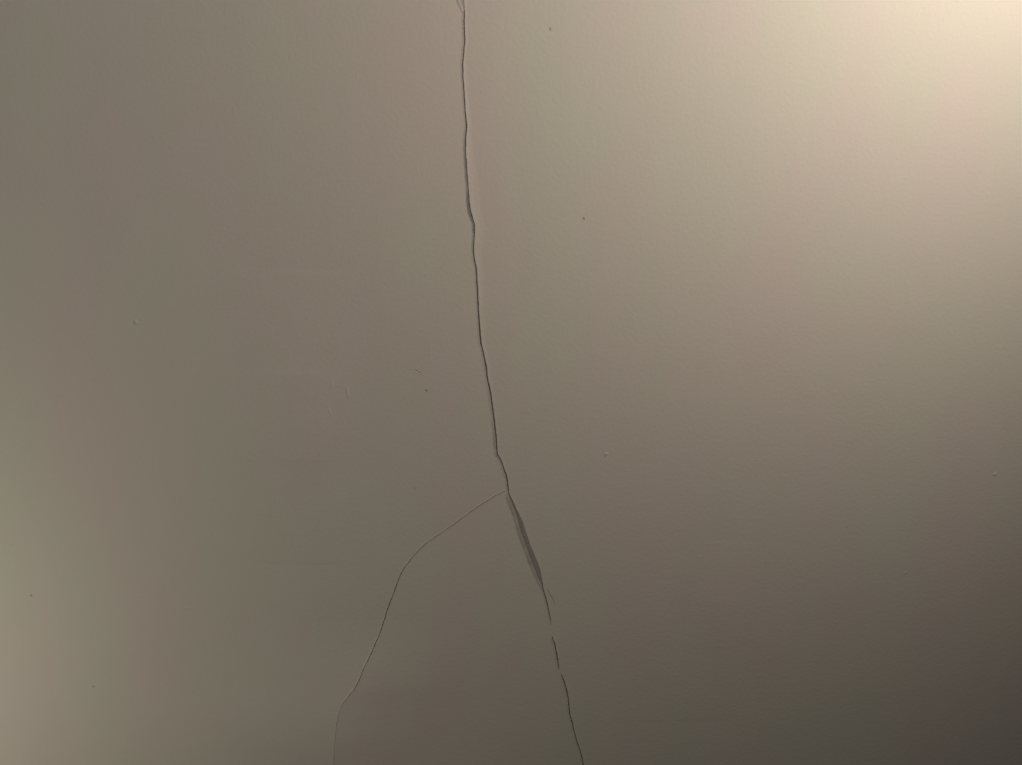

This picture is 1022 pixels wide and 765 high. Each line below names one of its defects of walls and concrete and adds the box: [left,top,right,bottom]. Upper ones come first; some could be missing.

crack [332,11,511,765]
crack [540,587,587,765]